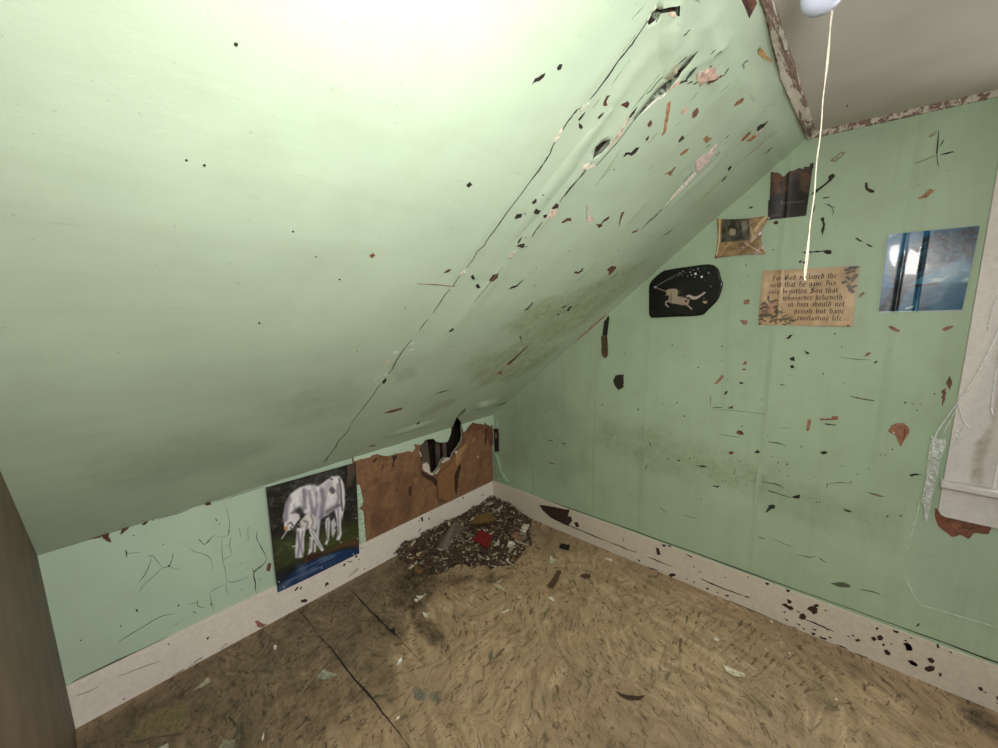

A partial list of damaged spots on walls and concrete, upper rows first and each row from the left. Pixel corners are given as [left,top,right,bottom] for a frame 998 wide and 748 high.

peeling [662,101,699,136]
peeling [586,205,624,228]
crack [325,22,663,463]
peeling [888,423,909,446]
peeling [343,411,497,577]
peeling [935,508,991,539]
crack [120,509,271,641]
peeling [782,589,832,640]
peeling [847,623,942,677]